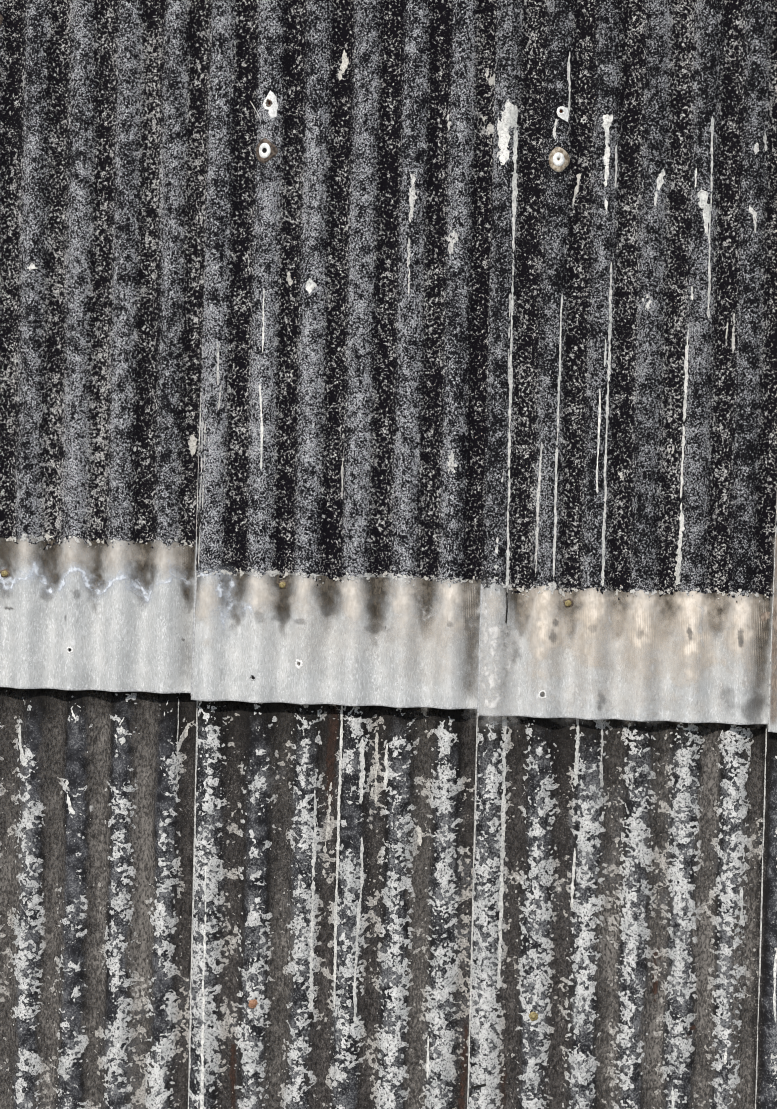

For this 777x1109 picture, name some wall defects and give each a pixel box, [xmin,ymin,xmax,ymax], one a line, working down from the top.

water stain [0,99,772,709]
peeling [0,700,777,1109]